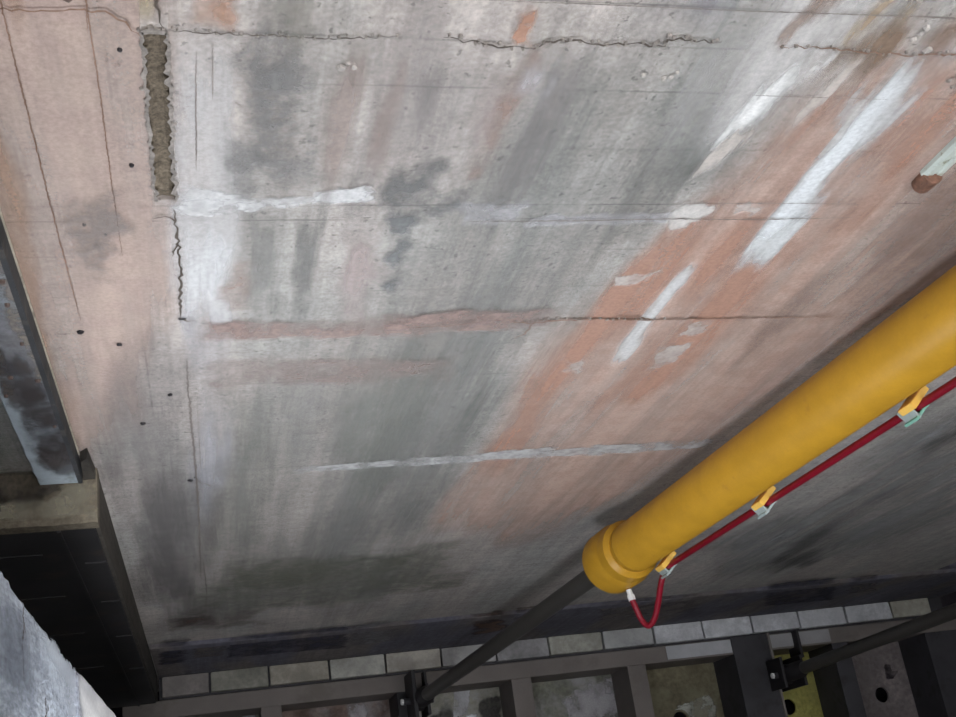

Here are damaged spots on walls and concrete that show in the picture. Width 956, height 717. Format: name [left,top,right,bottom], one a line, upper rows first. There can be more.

corrosion [0,0,168,474]
spalling [137,25,179,202]
crack [0,0,399,322]
leakage [173,162,447,326]
corrosion [207,310,542,339]
crack [443,33,719,51]
leakage [615,267,690,360]
leakage [655,327,704,361]
efflorescence [653,204,714,229]
corrosion [456,94,956,538]
crack [489,0,956,18]
efflorescence [744,67,918,261]